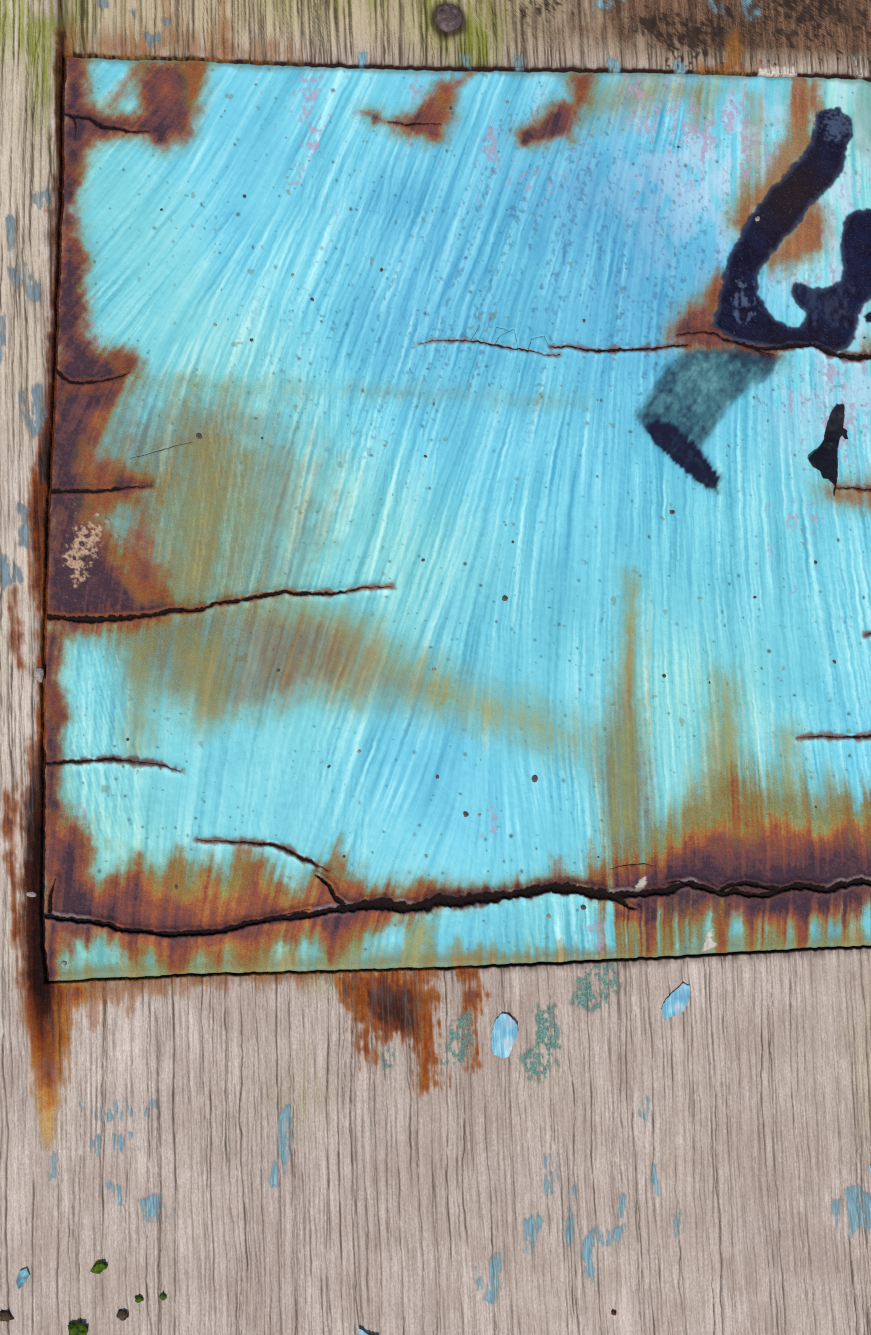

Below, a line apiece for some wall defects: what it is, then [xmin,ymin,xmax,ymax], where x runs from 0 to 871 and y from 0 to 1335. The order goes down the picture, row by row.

crack [63,112,151,137]
corrosion [518,76,589,146]
corrosion [736,78,823,229]
corrosion [769,203,824,269]
crack [420,327,871,362]
corrosion [667,275,778,358]
crack [46,584,394,624]
corrosion [2,31,545,1146]
crack [46,755,181,772]
crack [796,732,871,741]
crack [43,837,871,940]
corrosion [554,764,871,957]